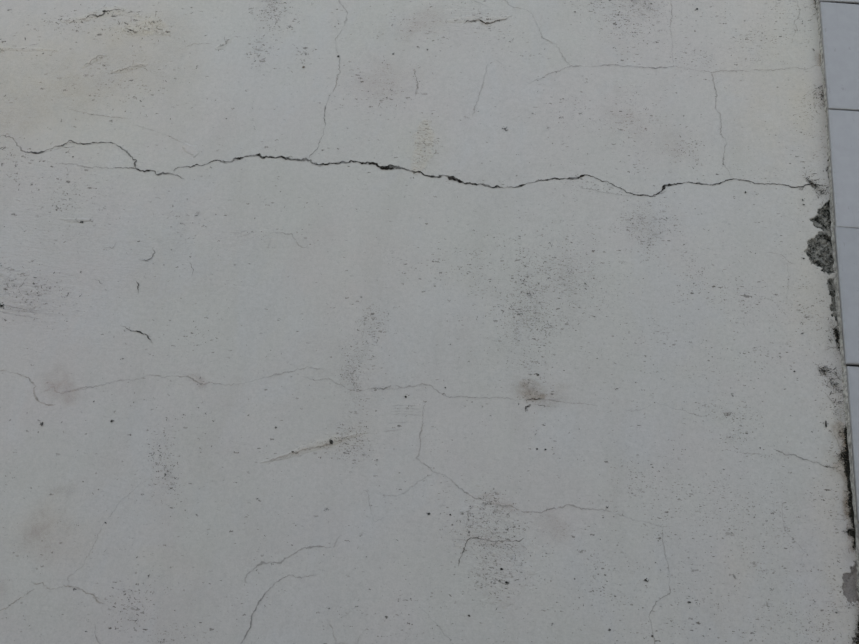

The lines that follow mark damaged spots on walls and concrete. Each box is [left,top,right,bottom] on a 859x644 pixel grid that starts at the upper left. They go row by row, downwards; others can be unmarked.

crack [27,140,818,196]
spalling [803,200,837,321]
mould [827,426,858,563]